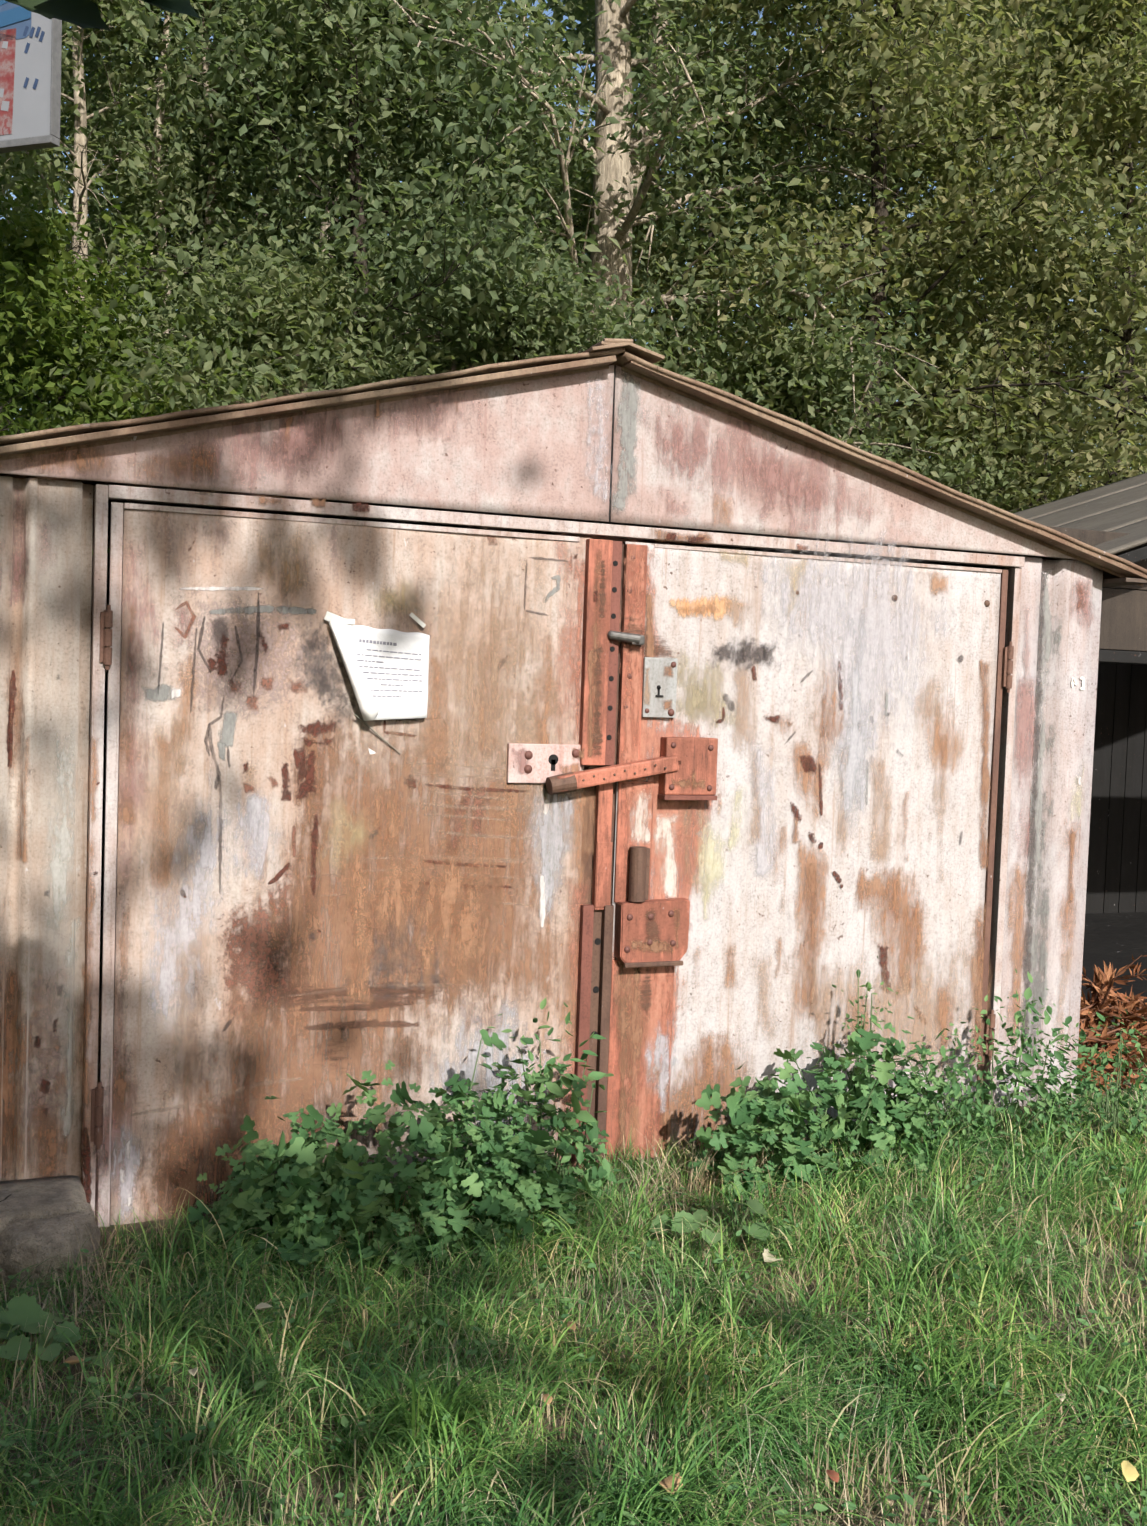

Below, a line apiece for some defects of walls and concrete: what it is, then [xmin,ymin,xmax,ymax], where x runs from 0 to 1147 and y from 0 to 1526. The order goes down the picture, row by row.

rust [0,490,27,604]
rust [312,498,326,507]
rust [353,502,370,512]
rust [656,529,711,544]
rust [658,417,862,527]
rust [932,573,947,592]
rust [622,548,712,900]
rust [980,660,990,868]
rust [0,541,606,1220]
rust [781,661,988,1063]
rust [611,952,745,1163]